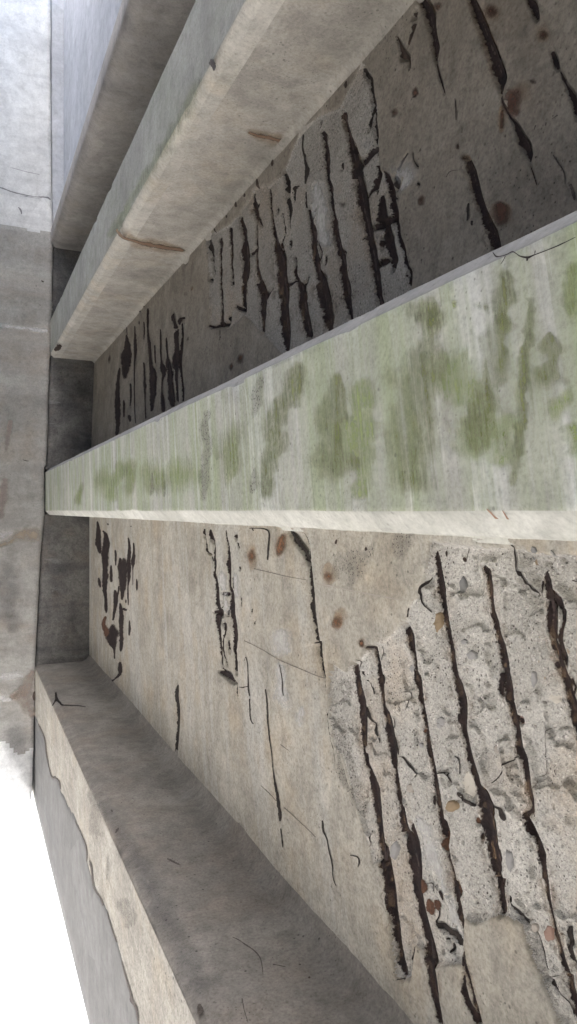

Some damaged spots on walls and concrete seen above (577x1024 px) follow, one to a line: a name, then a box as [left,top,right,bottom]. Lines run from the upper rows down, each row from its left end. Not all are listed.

rust [500,90,520,128]
rust [116,229,184,252]
spalling [205,67,413,354]
rust [494,202,509,224]
rust [276,534,285,555]
crack [249,528,335,761]
peeling [34,669,204,1024]
crack [240,657,284,847]
crack [357,646,519,837]
crack [436,923,464,953]
spalling [328,541,577,1024]
crack [510,896,577,1014]